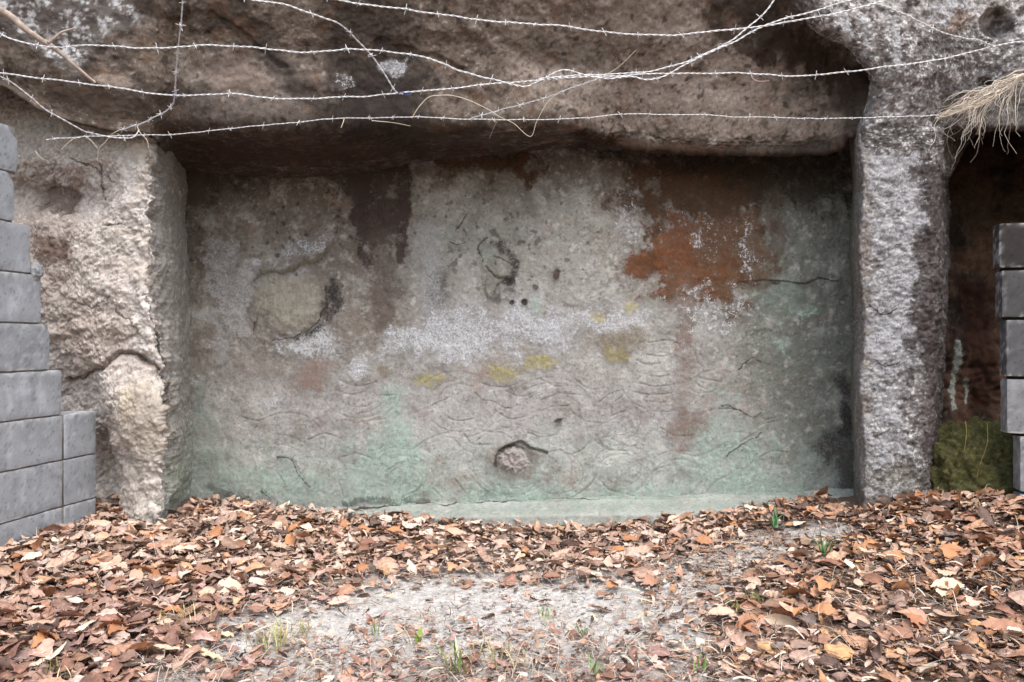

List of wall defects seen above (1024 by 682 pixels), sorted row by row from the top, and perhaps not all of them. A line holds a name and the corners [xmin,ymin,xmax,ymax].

leakage [326,163,412,266]
corrosion [573,129,785,323]
crack [737,277,839,285]
spalling [494,441,548,474]